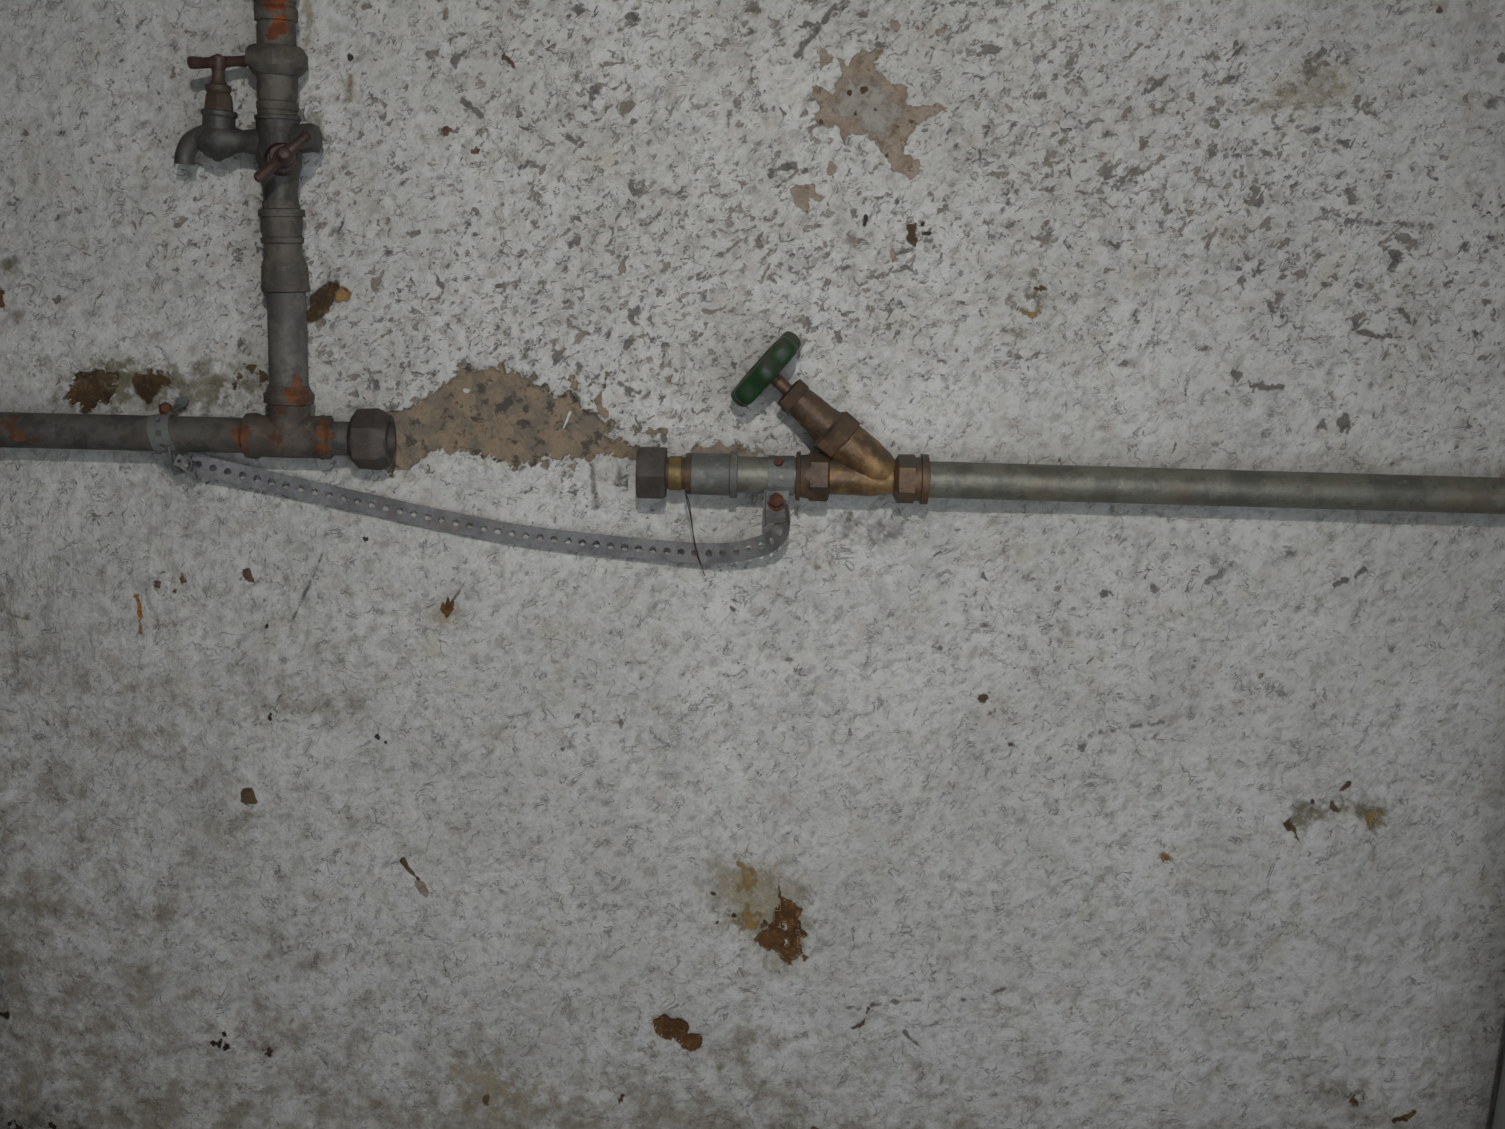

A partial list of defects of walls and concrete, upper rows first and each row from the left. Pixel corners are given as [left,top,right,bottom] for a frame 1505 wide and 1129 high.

peeling [812,47,948,180]
peeling [768,161,837,212]
spalling [52,359,269,417]
spalling [383,362,668,507]
peeling [682,434,773,457]
corrosion [711,862,809,965]